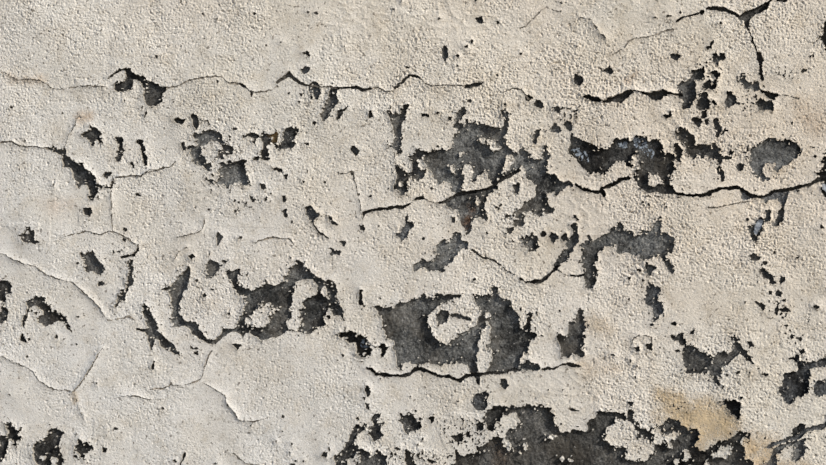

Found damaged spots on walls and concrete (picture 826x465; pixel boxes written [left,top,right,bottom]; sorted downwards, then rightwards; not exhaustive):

crack [519,0,800,100]
peeling [173,50,348,212]
crack [583,89,683,103]
peeling [45,143,116,227]
crack [337,168,521,219]
peeling [368,40,826,352]
crack [575,176,631,197]
crack [675,175,826,208]
crack [365,366,521,383]
peeling [110,232,816,465]
peeling [745,207,826,408]
peeling [0,417,107,465]